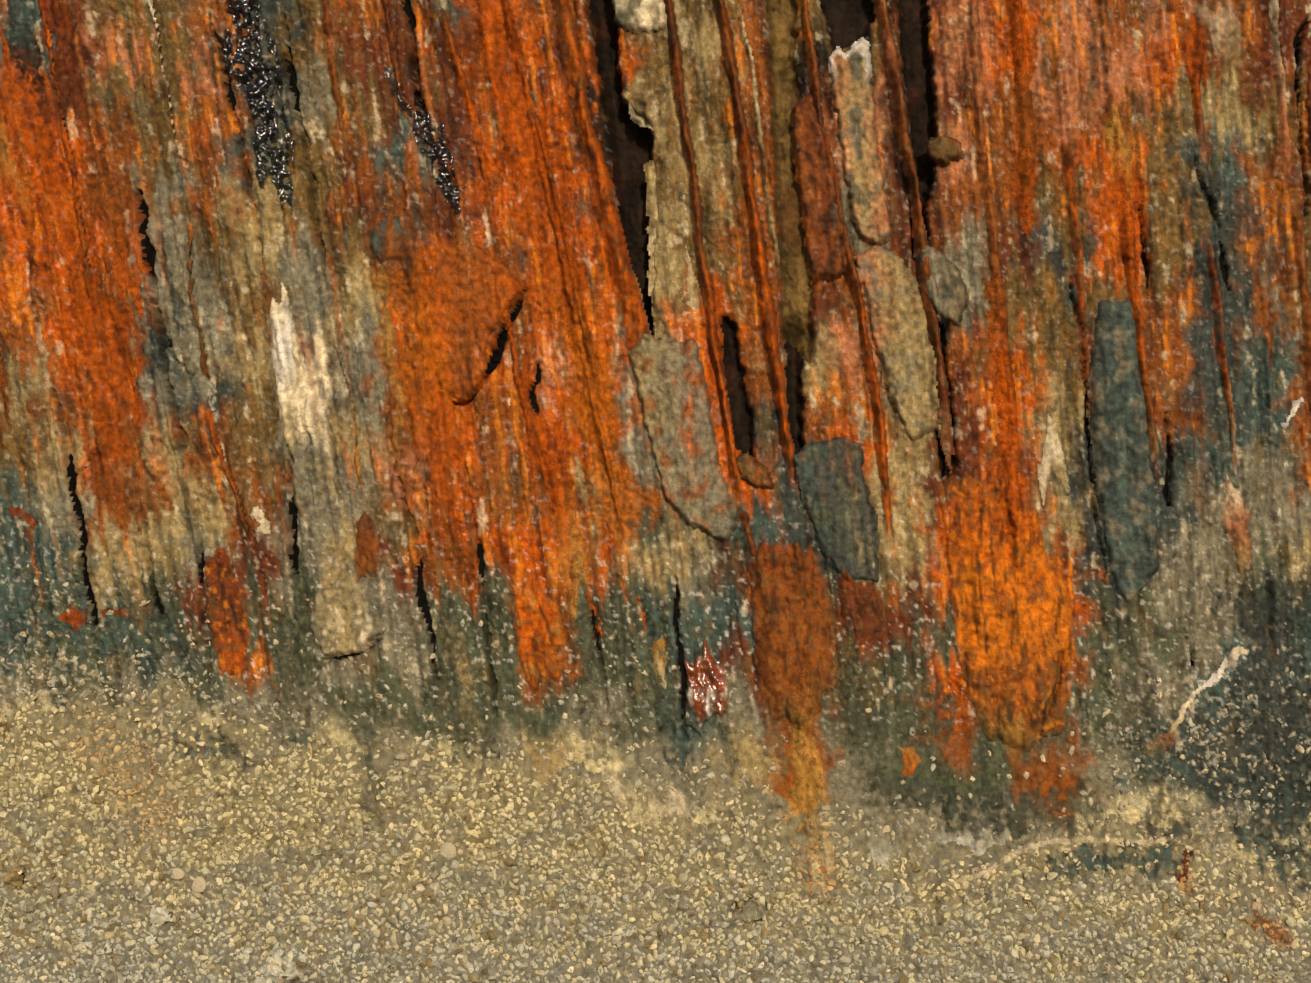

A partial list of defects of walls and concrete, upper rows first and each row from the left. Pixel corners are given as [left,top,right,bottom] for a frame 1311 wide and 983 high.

corrosion [0,0,174,538]
crack [137,190,156,276]
corrosion [367,0,774,637]
crack [67,454,99,626]
leakage [0,546,167,675]
crack [415,558,436,663]
crack [477,543,485,578]
leakage [574,574,693,825]
corrosion [637,598,667,689]
leakage [833,621,1202,886]
corrosion [1085,299,1160,604]
leakage [1143,574,1311,890]